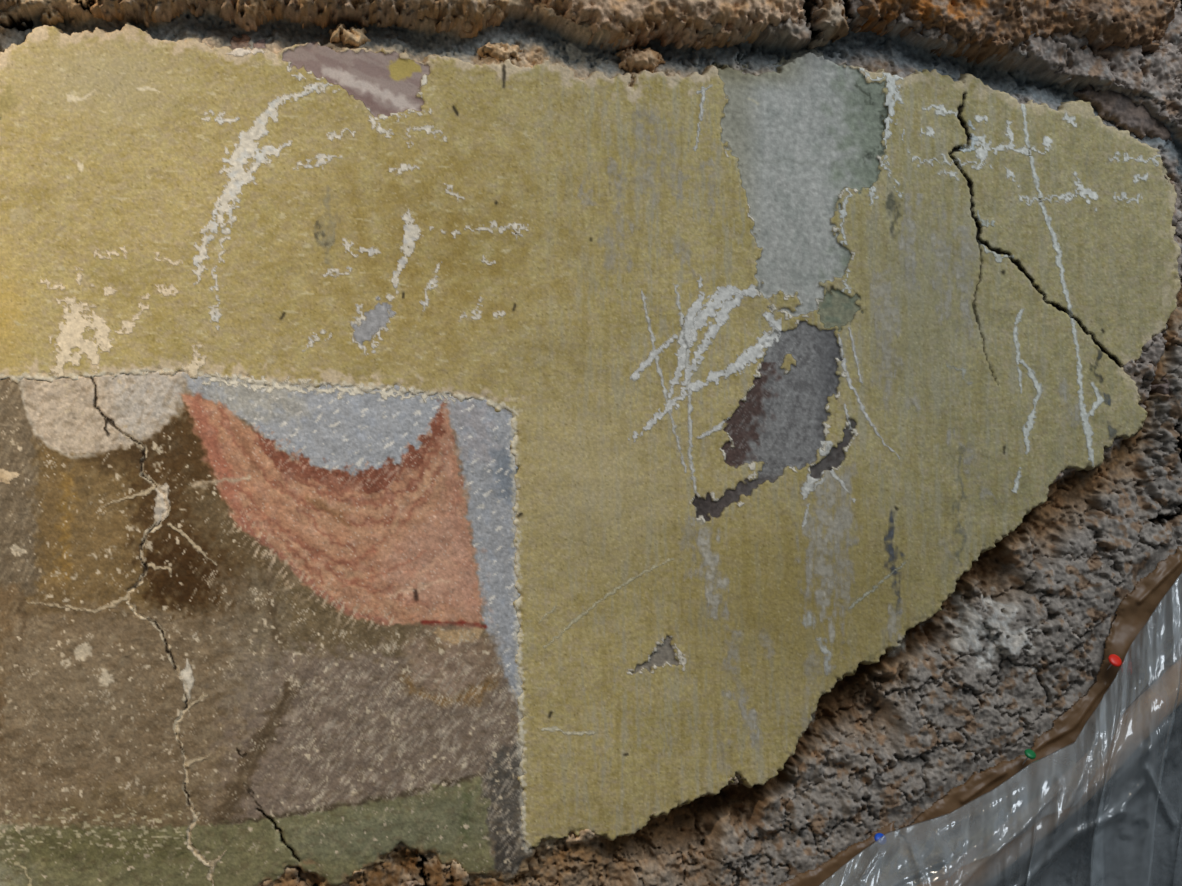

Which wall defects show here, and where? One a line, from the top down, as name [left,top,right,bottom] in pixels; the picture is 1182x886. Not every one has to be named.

peeling [40,268,179,378]
peeling [94,246,127,259]
flaking render [155,42,447,330]
peeling [302,329,332,351]
peeling [351,209,529,355]
peeling [690,49,1098,522]
crack [949,93,1121,379]
peeling [1109,151,1161,203]
crack [28,376,227,886]
flaking render [627,636,686,675]
crack [247,788,318,886]
crack [416,855,430,886]